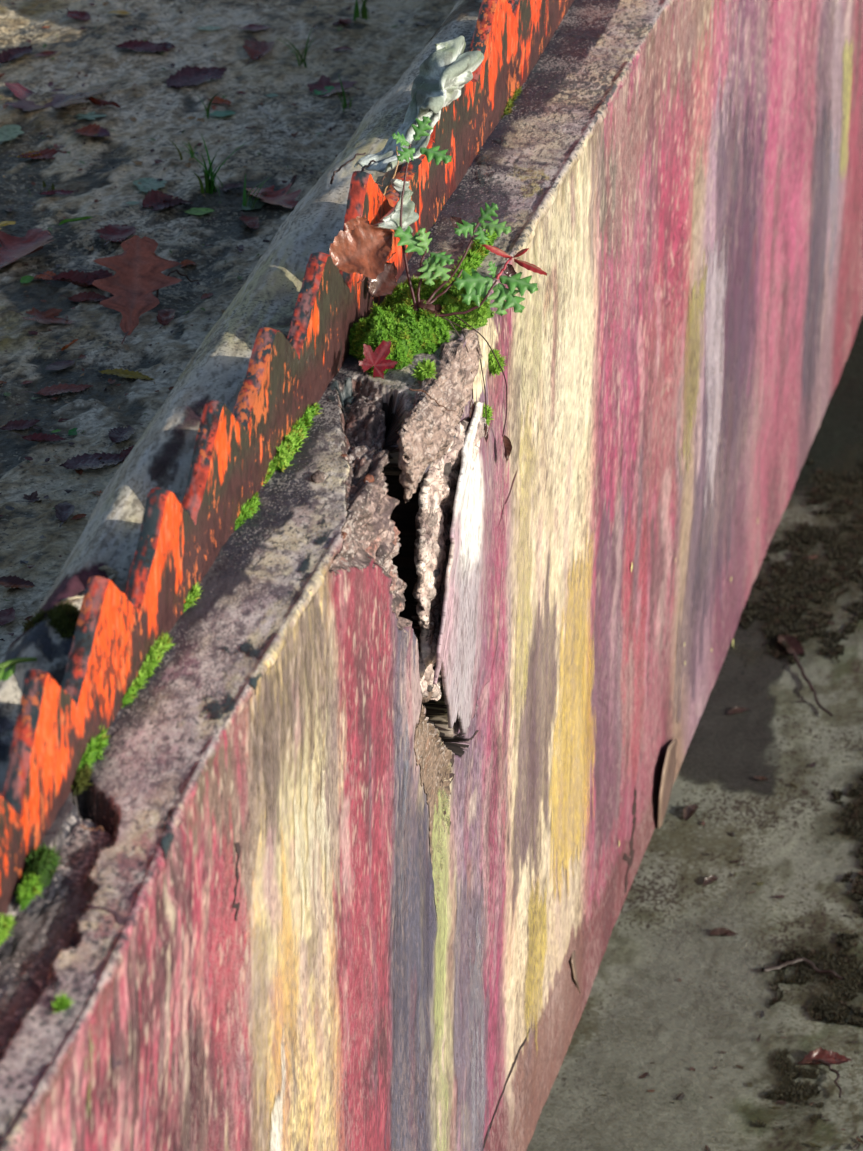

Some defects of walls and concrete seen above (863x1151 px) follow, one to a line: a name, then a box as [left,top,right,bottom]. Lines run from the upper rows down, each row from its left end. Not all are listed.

peeling [296,377,502,734]
crack [382,394,426,663]
spalling [0,781,119,1061]
peeling [160,806,174,860]
crack [414,686,479,921]
rust [526,530,594,1031]